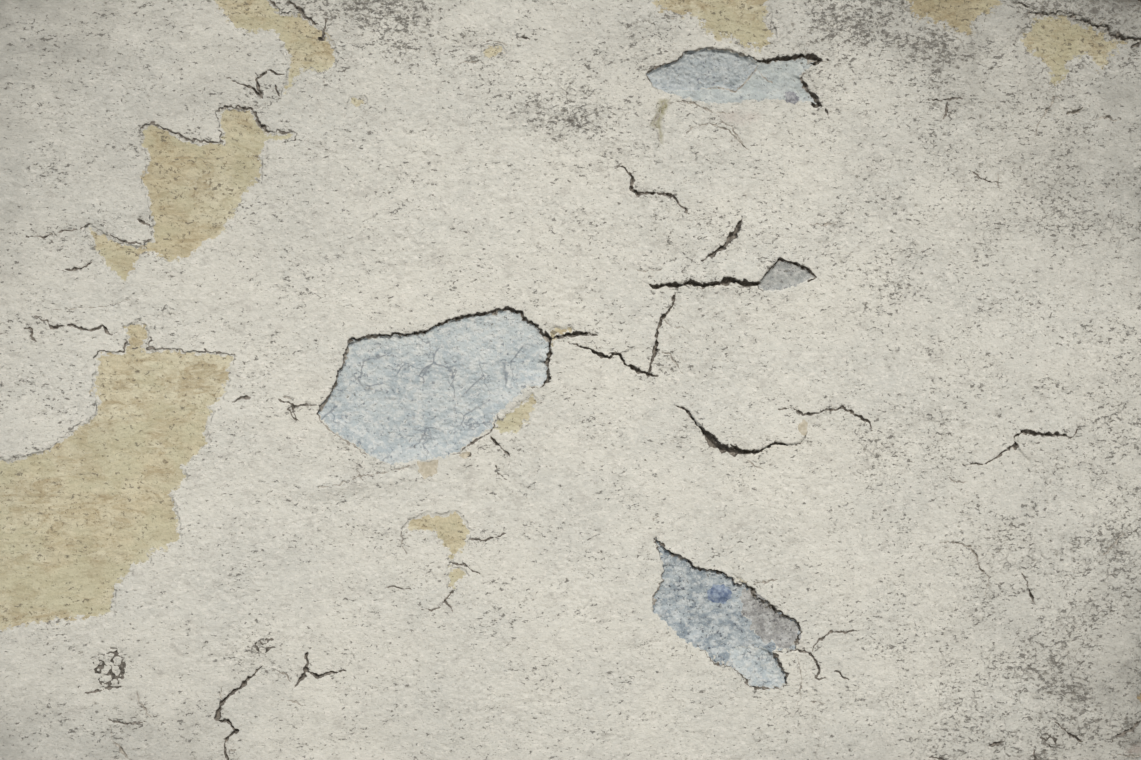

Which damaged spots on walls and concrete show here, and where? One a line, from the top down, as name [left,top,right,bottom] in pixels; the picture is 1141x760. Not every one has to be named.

flaking render [211,0,339,101]
flaking render [646,0,832,150]
crack [1018,2,1141,47]
flaking render [84,107,296,289]
crack [614,166,689,214]
crack [568,216,760,377]
flaking render [0,319,235,634]
flaking render [283,306,598,488]
crack [675,405,873,469]
crack [948,429,1078,483]
flaking render [652,537,857,705]
crack [214,652,347,760]